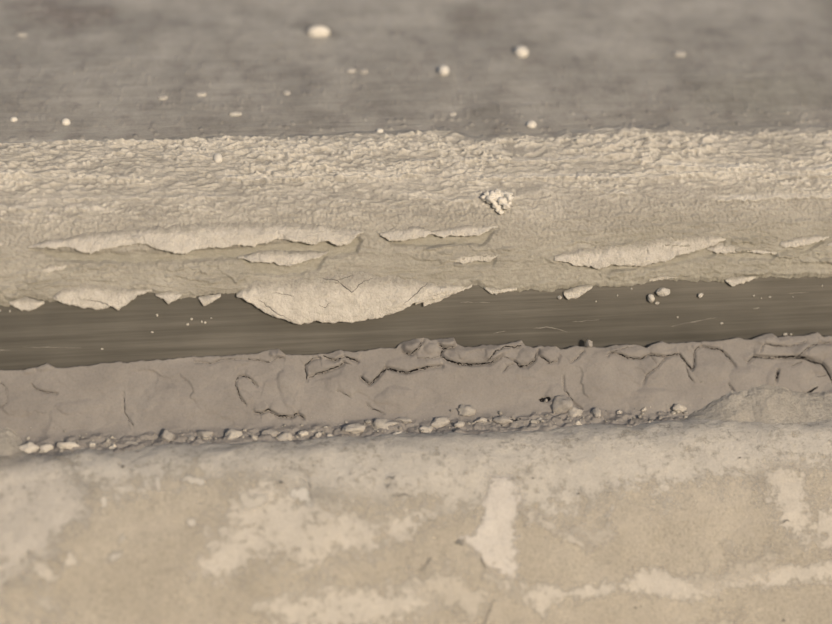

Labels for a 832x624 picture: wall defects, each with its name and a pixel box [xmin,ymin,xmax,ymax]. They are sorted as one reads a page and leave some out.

peeling [379,225,498,242]
peeling [9,222,472,325]
peeling [450,253,497,264]
peeling [484,287,517,295]
peeling [563,285,592,300]
peeling [554,235,832,269]
peeling [725,276,756,287]
crack [304,343,584,385]
crack [609,342,832,393]
crack [197,357,303,419]
peeling [454,473,524,579]